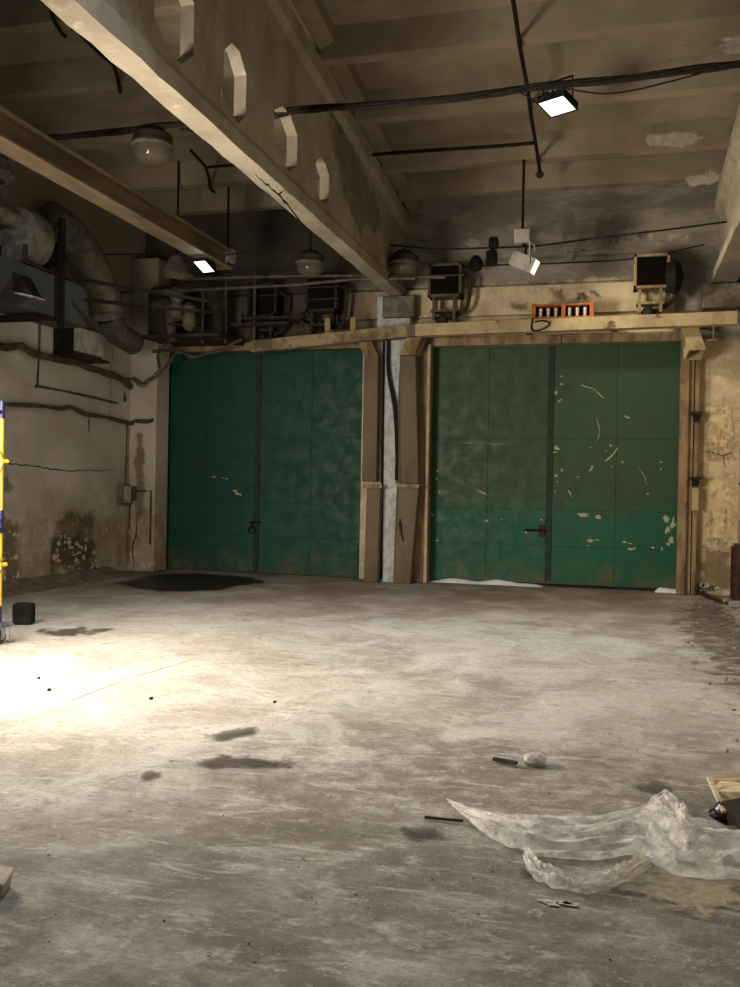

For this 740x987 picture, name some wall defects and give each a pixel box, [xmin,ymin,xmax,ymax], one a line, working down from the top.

peeling [699,400,737,550]
peeling [2,520,22,581]
peeling [51,534,100,574]
peeling [651,515,676,551]
leakage [120,573,263,591]